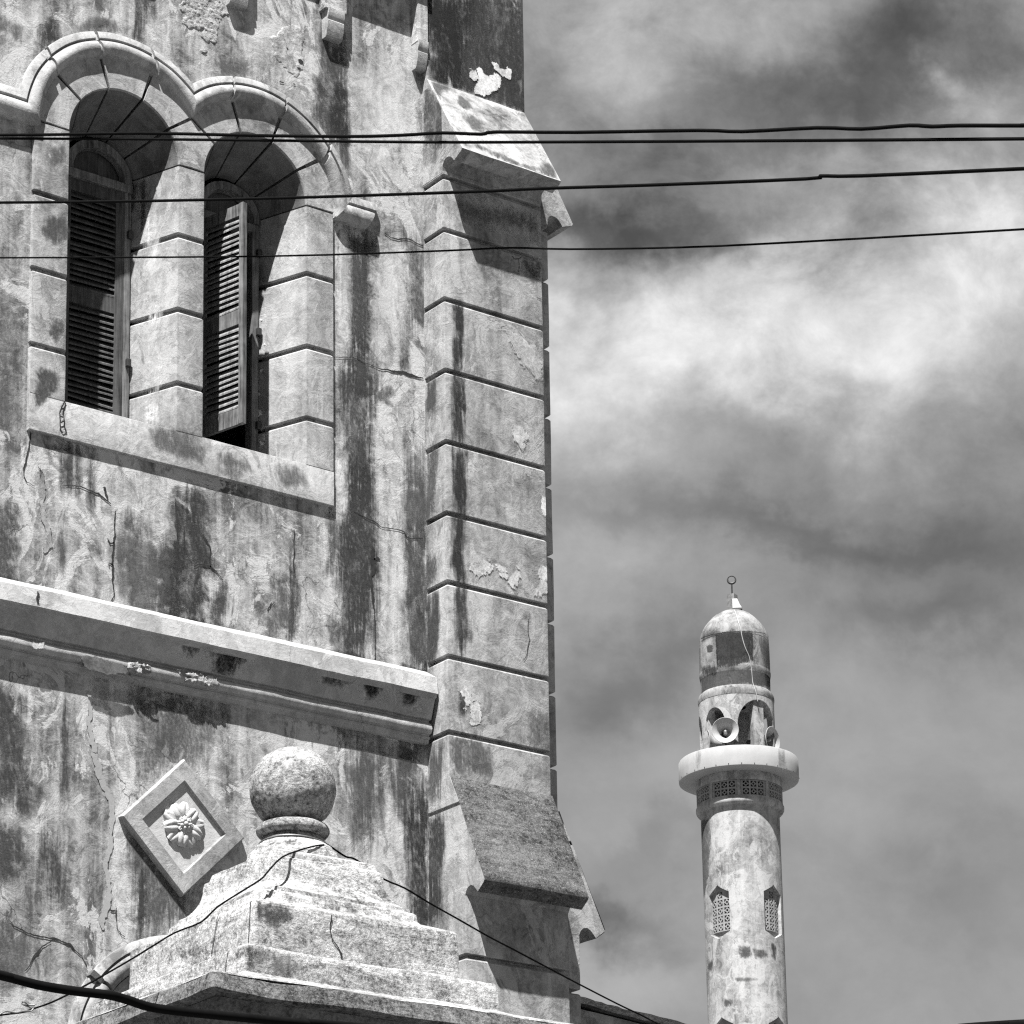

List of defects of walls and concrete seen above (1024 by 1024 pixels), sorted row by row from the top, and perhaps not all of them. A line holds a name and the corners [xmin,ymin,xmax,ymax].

peeling [469,62,512,97]
leakage [0,0,424,660]
crack [339,357,423,379]
leakage [426,377,436,411]
leakage [451,301,472,657]
leakage [402,450,439,672]
peeling [469,558,521,589]
peeling [534,566,547,597]
spalling [176,668,220,689]
peeling [460,686,482,726]
crack [86,691,125,937]
crack [9,920,87,971]